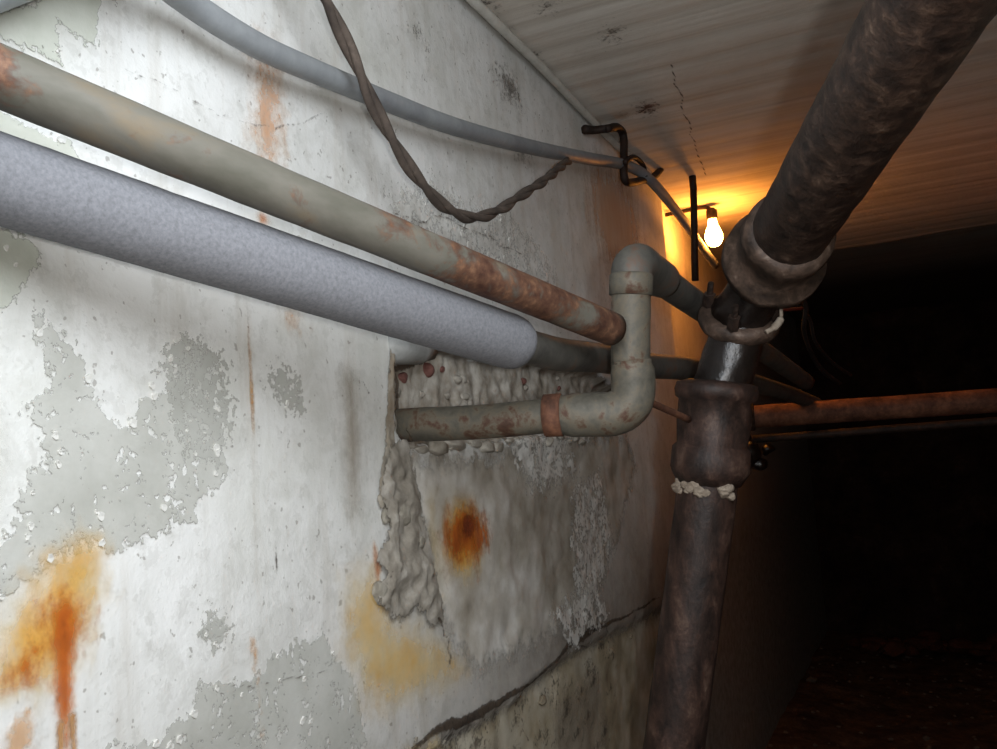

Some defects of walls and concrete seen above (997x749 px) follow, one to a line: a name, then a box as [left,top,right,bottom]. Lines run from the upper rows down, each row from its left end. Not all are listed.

peeling [0,229,42,308]
peeling [260,363,307,419]
peeling [0,308,239,600]
rust [444,506,488,570]
flaking render [370,336,661,749]
rust [0,554,93,749]
peeling [105,633,368,749]
leakage [355,589,443,691]
crack [411,597,659,749]